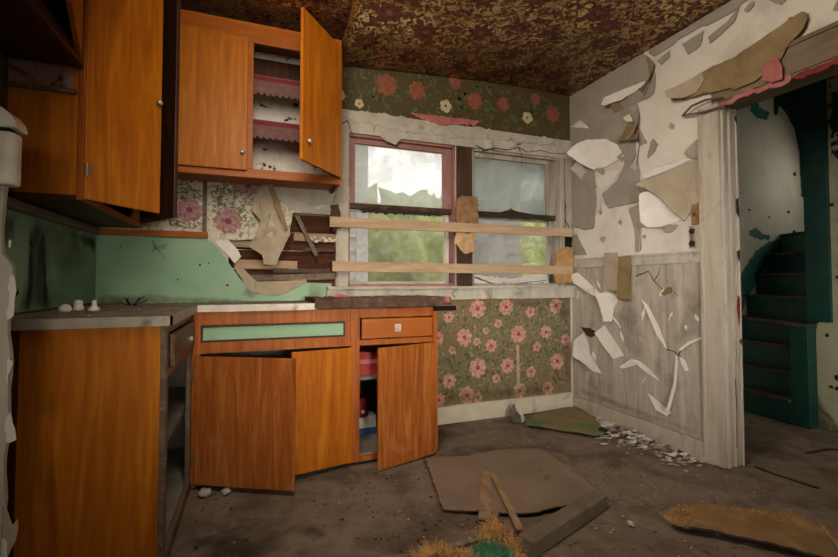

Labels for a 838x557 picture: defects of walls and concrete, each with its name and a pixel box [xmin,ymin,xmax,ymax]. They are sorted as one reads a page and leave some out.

crack [476,134,566,163]
peeling [342,0,754,215]
peeling [718,57,838,197]
flaking render [215,177,350,296]
peeling [565,234,587,256]
peeling [571,191,687,383]
peeling [648,337,701,417]